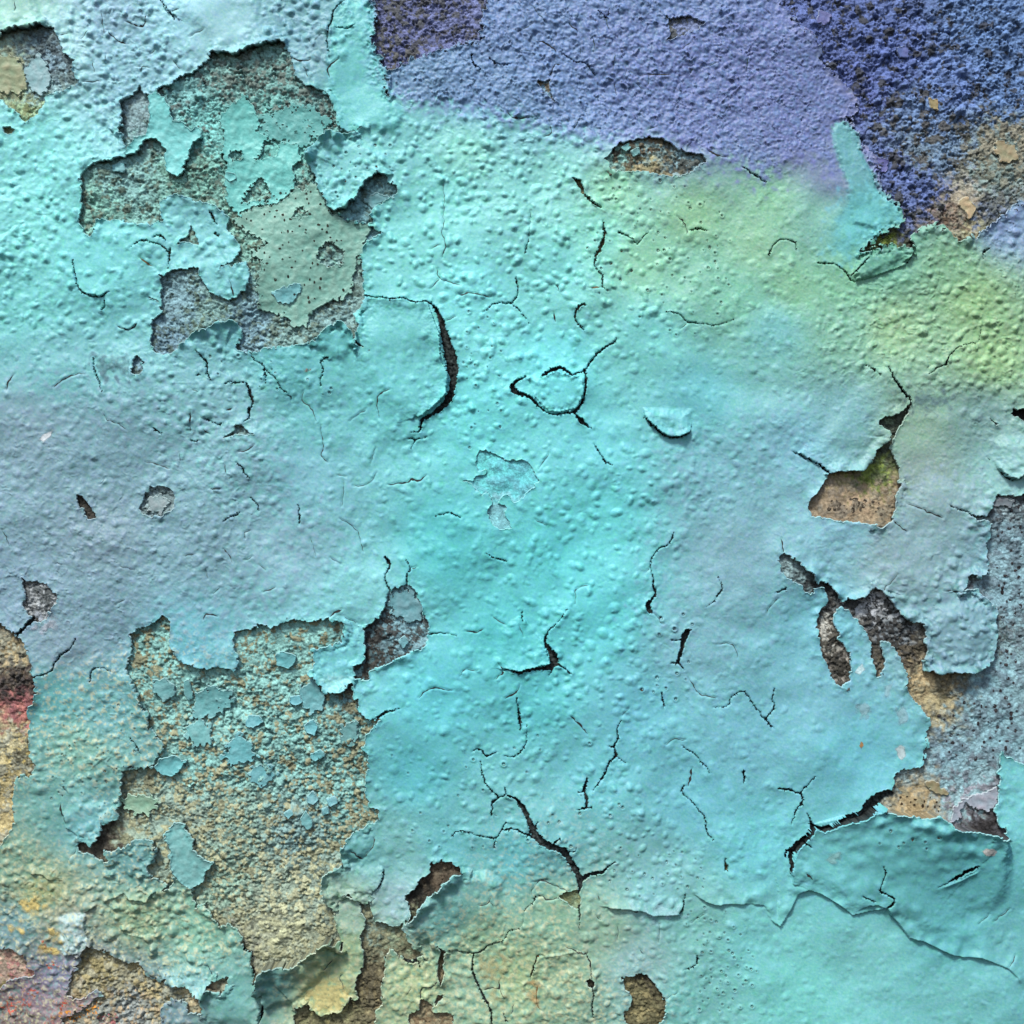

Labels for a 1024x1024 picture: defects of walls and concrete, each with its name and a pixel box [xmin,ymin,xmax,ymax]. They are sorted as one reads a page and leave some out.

peeling [0,21,79,134]
peeling [78,39,398,366]
crack [364,177,648,466]
peeling [604,135,707,177]
peeling [779,0,1024,253]
peeling [808,401,912,529]
peeling [0,623,38,846]
peeling [57,584,463,1024]
crack [371,585,638,1024]
crack [645,532,776,728]
peeling [777,493,1024,842]
peeling [621,973,667,1024]